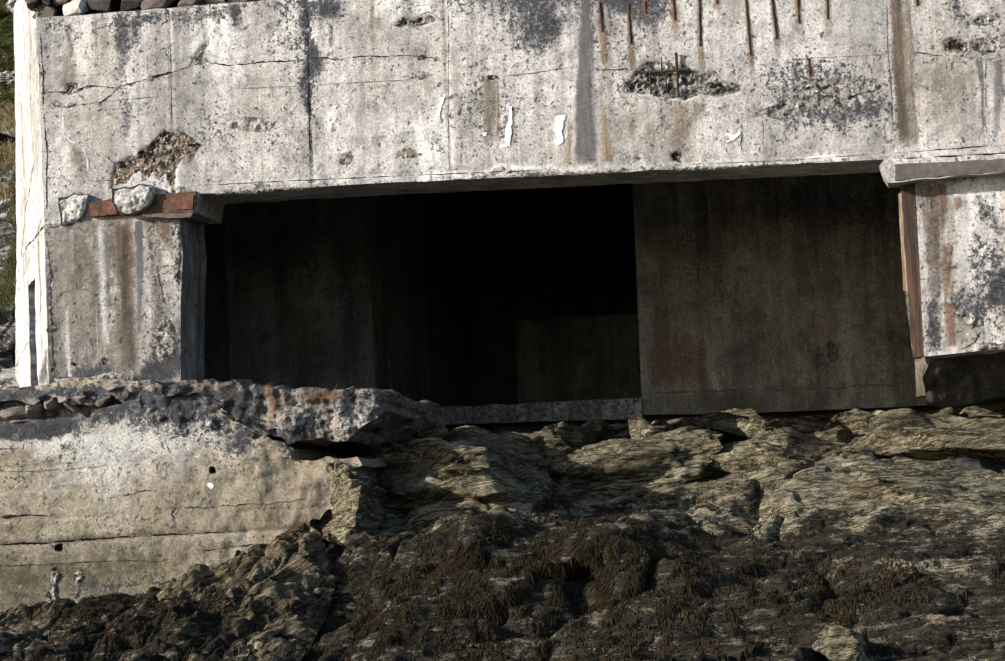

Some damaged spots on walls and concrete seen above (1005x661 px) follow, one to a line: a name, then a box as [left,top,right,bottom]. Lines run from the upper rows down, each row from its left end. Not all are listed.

corrosion [598,2,606,56]
corrosion [627,1,648,63]
corrosion [745,0,754,68]
corrosion [770,0,779,50]
leakage [553,0,595,160]
spalling [623,52,742,100]
spalling [110,129,202,191]
crack [15,37,442,366]
leakage [0,422,75,452]
crack [2,512,46,520]